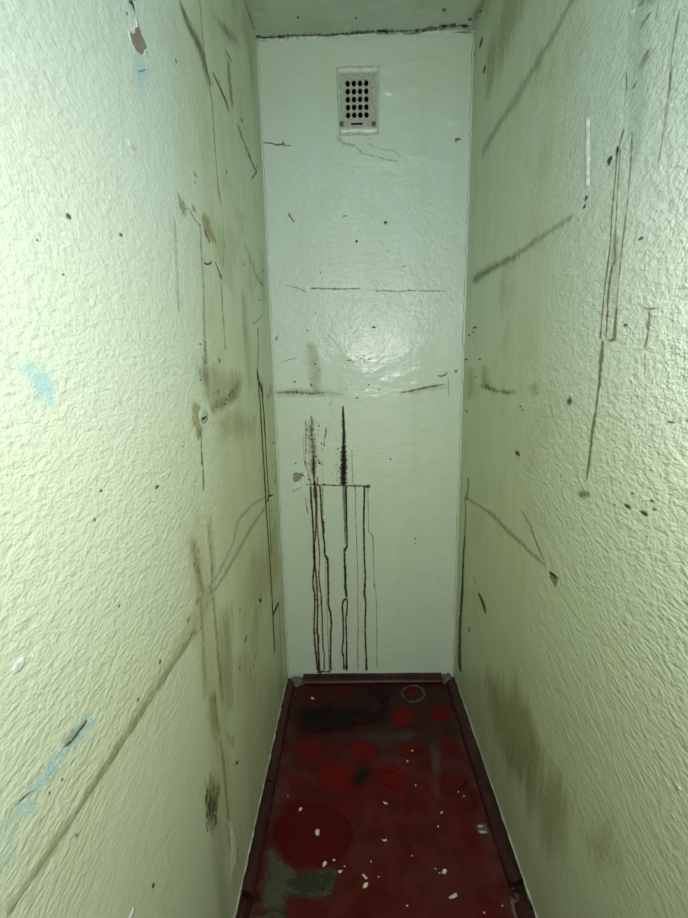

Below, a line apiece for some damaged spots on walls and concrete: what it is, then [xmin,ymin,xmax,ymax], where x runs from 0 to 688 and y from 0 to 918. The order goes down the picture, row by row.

peeling [128,0,148,57]
damp [205,774,220,831]